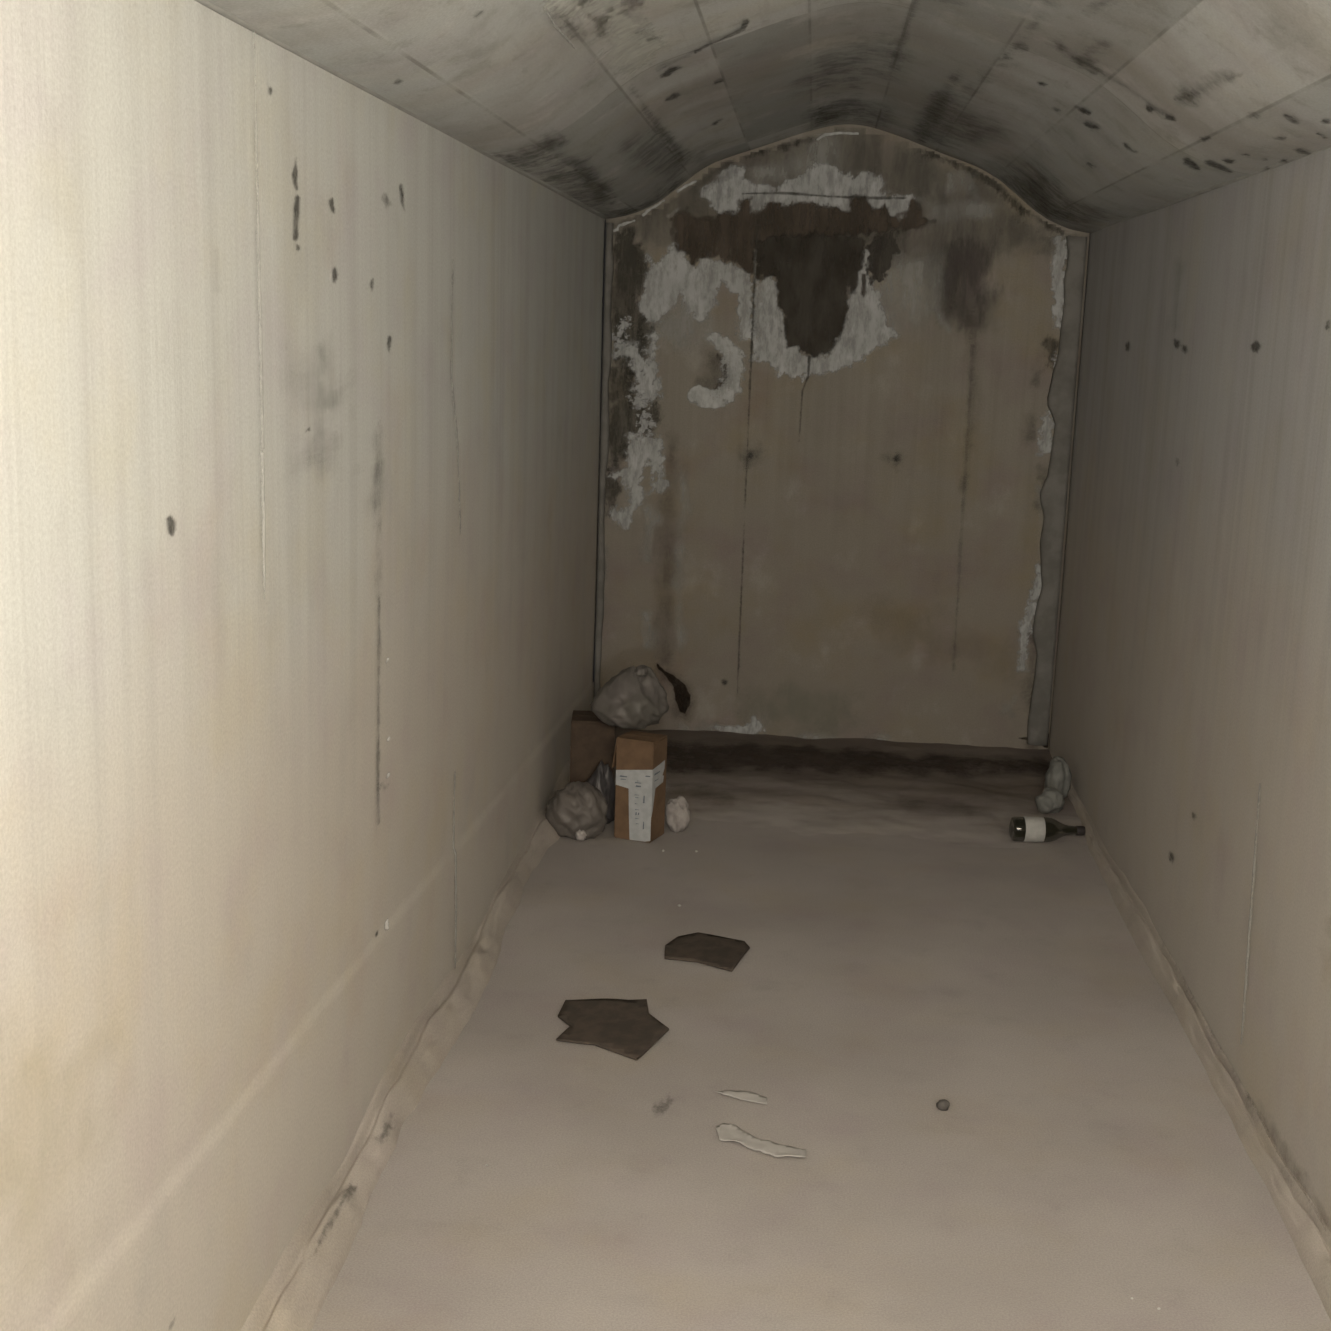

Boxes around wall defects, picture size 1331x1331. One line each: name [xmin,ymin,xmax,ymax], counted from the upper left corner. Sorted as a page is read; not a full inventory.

water stain [605,99,1068,529]
water stain [1017,564,1042,672]